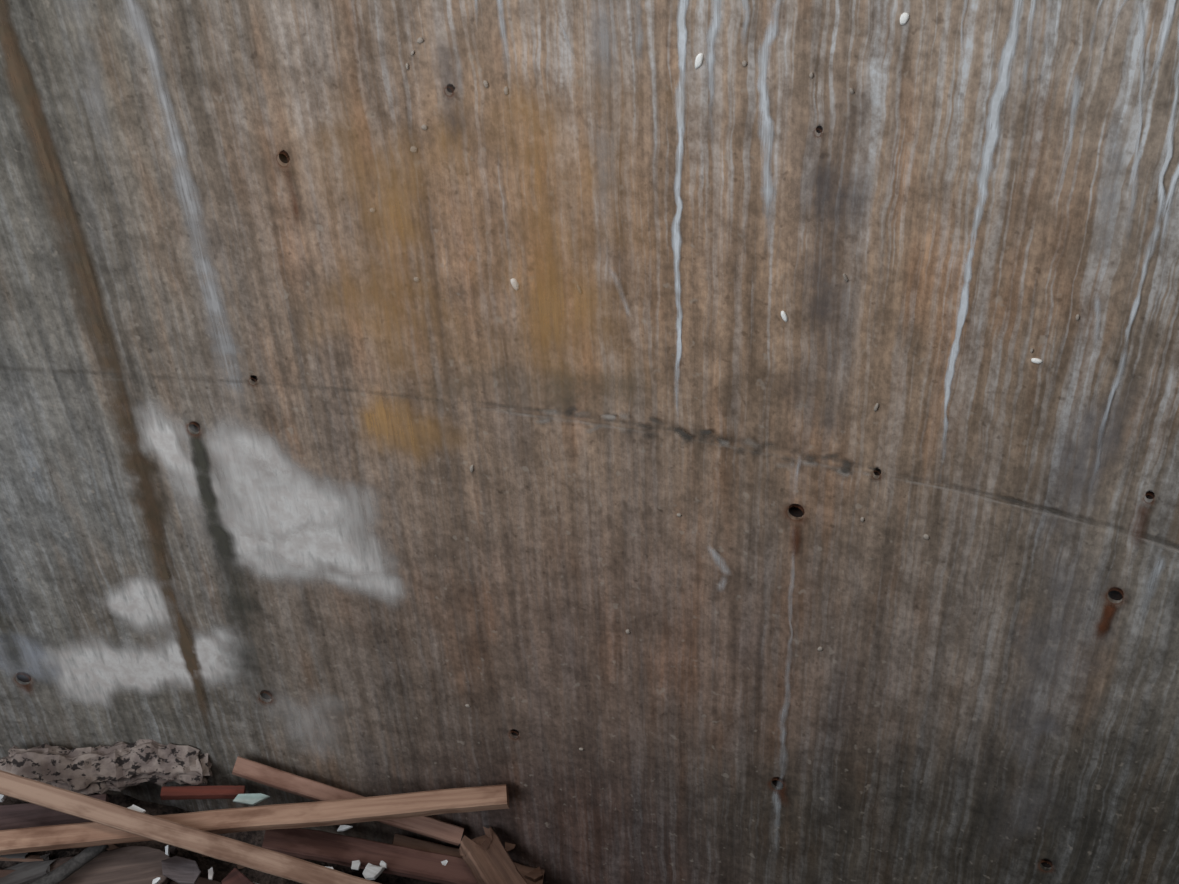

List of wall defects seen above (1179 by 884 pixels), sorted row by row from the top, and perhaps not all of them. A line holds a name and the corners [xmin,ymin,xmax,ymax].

efflorescence [672,0,688,378]
efflorescence [758,2,778,205]
efflorescence [944,0,1035,435]
efflorescence [1126,69,1179,338]
efflorescence [1132,0,1179,205]
leakage [14,630,248,704]
efflorescence [107,579,175,629]
leakage [141,408,400,619]
crack [539,407,740,453]
crack [768,443,874,480]
crack [972,490,1110,526]
rust [1097,604,1115,635]